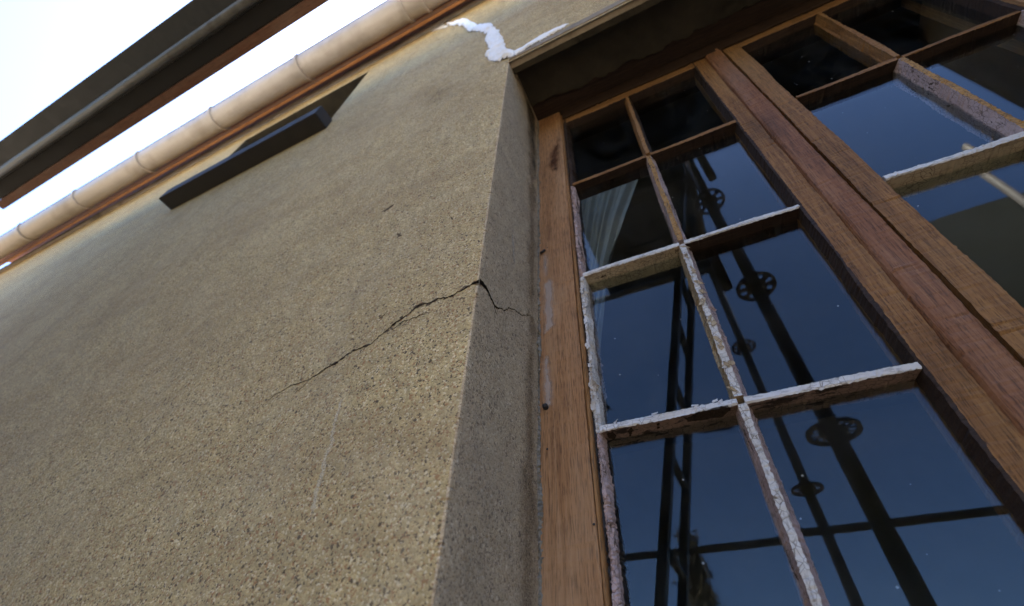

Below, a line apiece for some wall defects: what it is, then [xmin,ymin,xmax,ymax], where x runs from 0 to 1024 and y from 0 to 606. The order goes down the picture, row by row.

water stain [513,24,567,56]
crack [268,279,533,400]